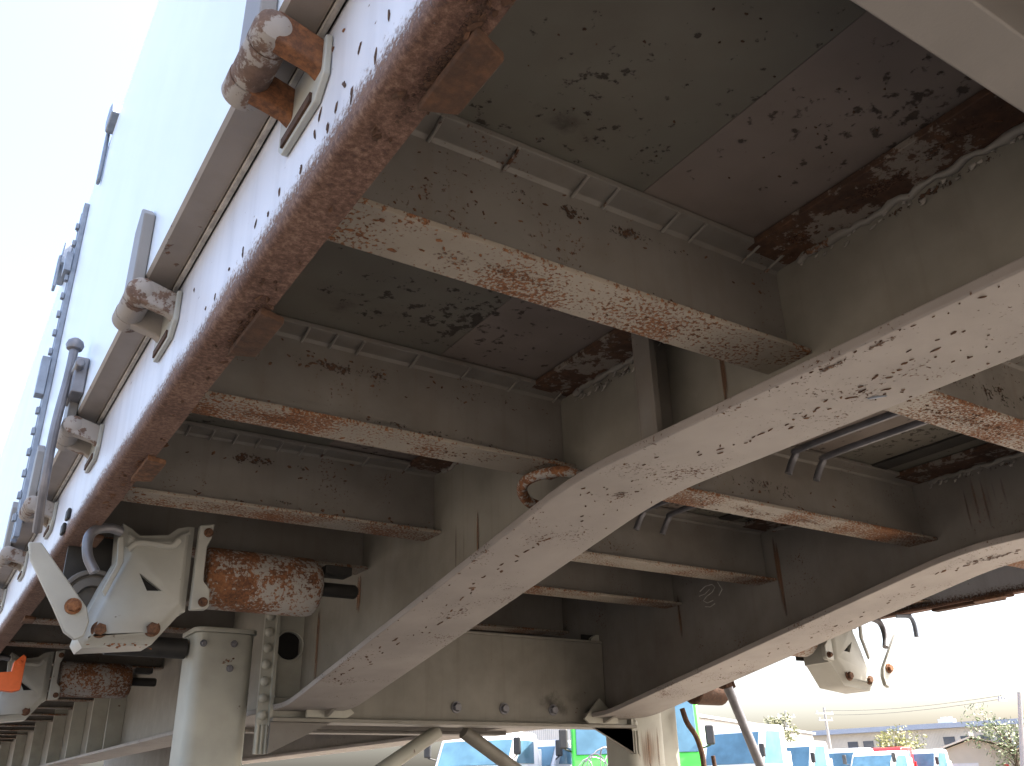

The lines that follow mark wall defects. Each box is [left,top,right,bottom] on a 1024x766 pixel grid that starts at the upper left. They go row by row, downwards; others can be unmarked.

rust [371,0,516,144]
rust [419,239,552,295]
rust [923,405,1024,449]